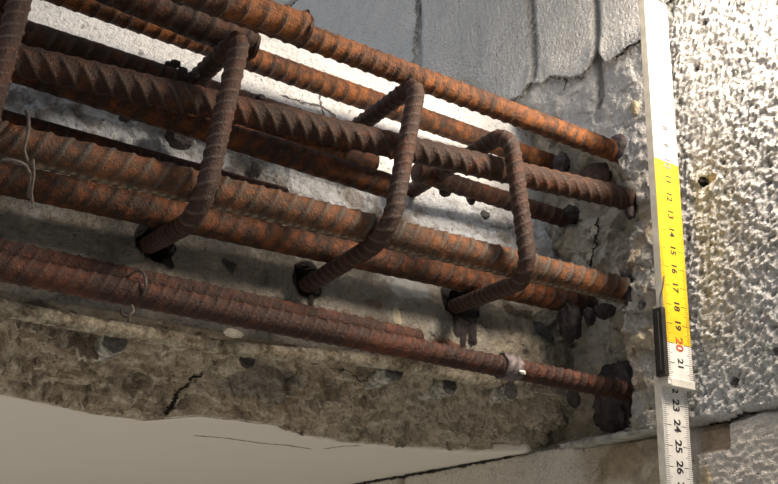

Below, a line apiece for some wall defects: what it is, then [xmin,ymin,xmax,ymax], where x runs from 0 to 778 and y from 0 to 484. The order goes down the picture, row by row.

spalling [11,0,619,165]
crack [512,40,641,101]
spalling [0,109,200,228]
spalling [0,238,506,376]
spalling [191,170,382,263]
spalling [226,89,405,199]
spalling [354,220,518,292]
spalling [410,107,512,212]
spalling [501,254,634,317]
spalling [519,142,638,228]
crack [589,217,599,268]
crack [164,371,203,415]